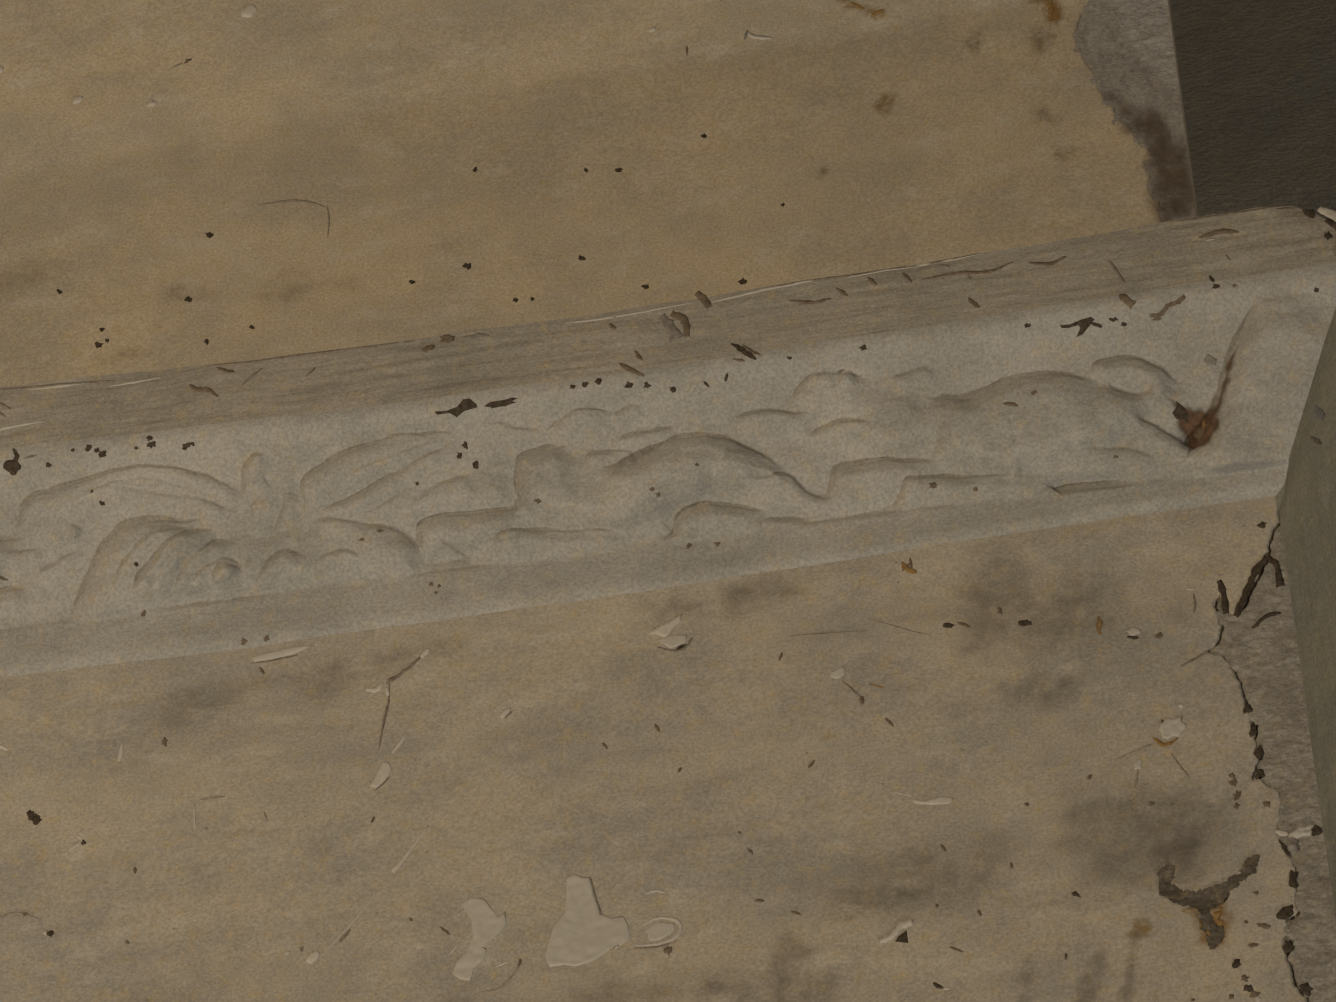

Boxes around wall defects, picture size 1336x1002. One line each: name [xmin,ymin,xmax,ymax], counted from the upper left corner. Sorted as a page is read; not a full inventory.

corrosion [1037,0,1060,23]
flaking render [1071,0,1336,257]
spalling [0,377,160,417]
spalling [212,333,489,386]
peeling [1060,317,1127,336]
peeling [1150,294,1186,321]
corrosion [1172,356,1234,448]
flaking render [1210,510,1336,1002]
peeling [450,898,522,993]
peeling [545,874,683,967]
flaking render [1157,854,1259,949]